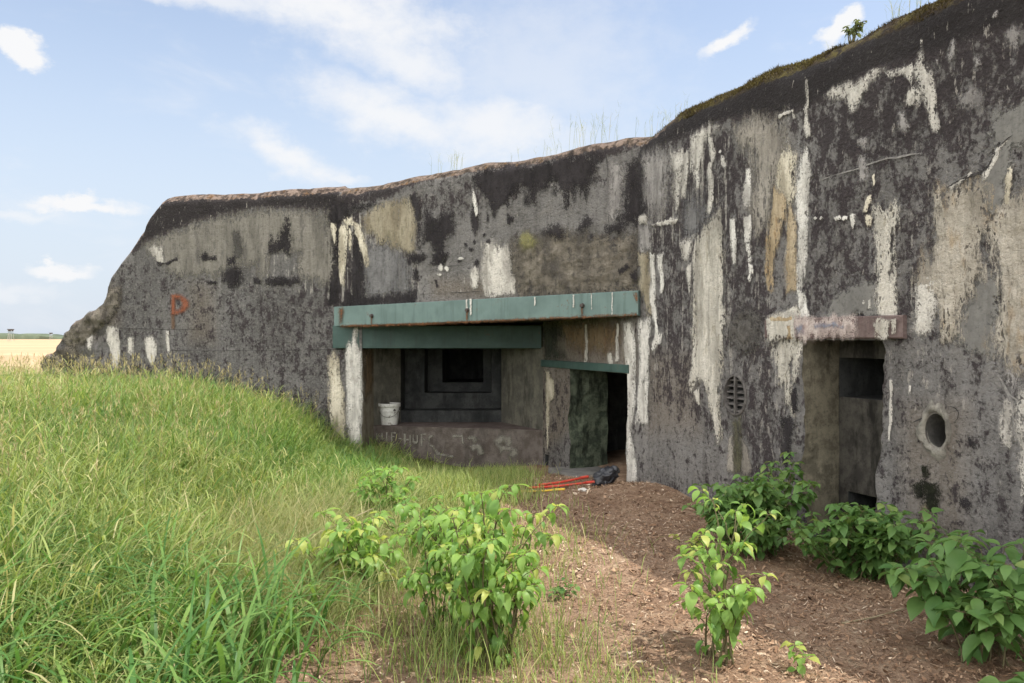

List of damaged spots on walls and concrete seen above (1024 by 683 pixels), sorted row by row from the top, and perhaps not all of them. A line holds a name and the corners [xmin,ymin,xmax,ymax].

crack [819,153,920,181]
water stain [199,230,302,290]
water stain [268,217,291,257]
water stain [327,148,648,306]
rust [338,294,638,354]